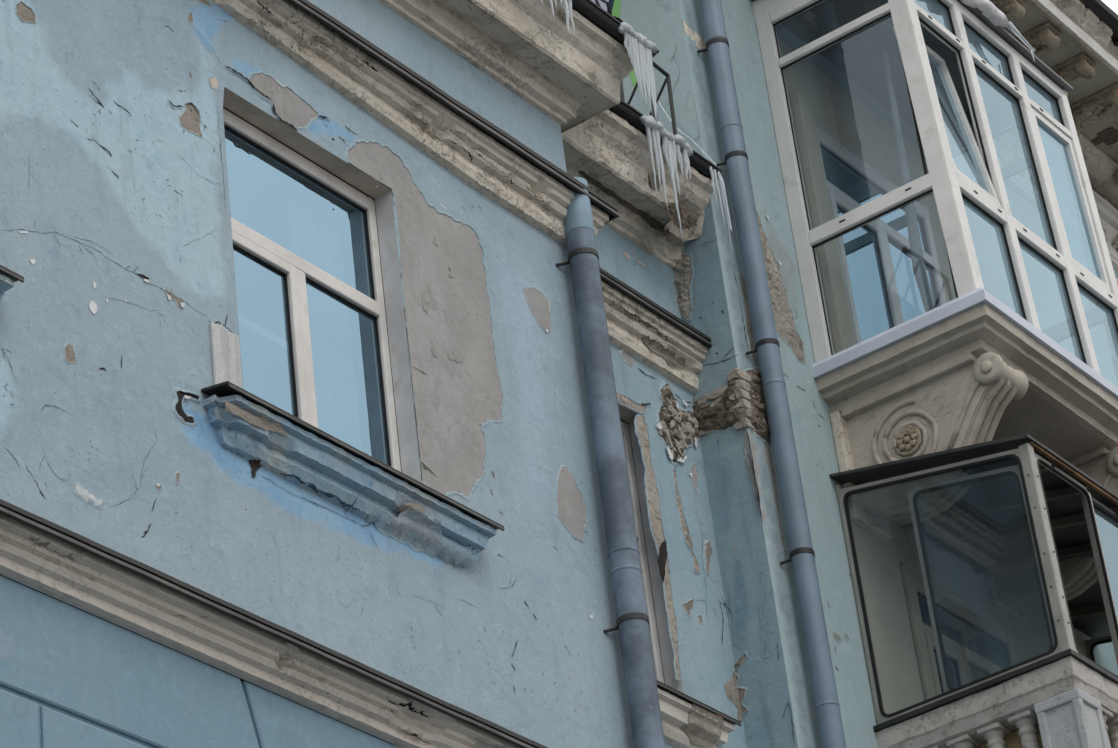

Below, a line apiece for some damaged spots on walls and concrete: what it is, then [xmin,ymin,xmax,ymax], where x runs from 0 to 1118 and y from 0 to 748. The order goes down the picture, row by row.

spalling [3,0,36,24]
spalling [167,90,215,150]
crack [1,221,234,334]
spalling [208,66,505,502]
spalling [513,281,561,334]
spalling [756,210,806,366]
spalling [555,465,587,543]
spalling [616,274,787,681]
spalling [724,651,750,721]
spalling [681,703,724,748]